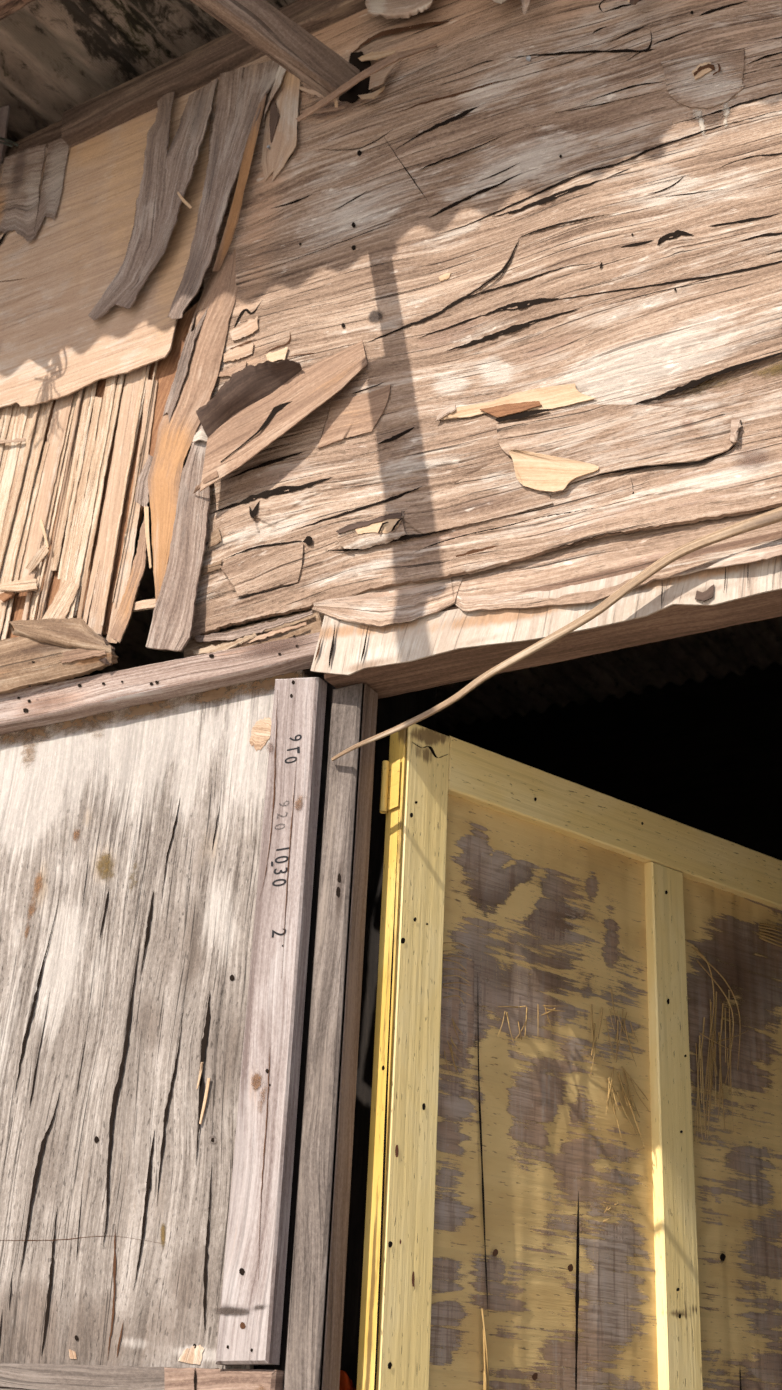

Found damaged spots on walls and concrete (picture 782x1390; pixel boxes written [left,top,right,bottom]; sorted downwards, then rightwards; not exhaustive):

peeling [365,0,433,19]
peeling [168,60,286,319]
crack [231,0,782,357]
spalling [0,361,158,644]
crack [212,427,737,559]
crack [634,352,782,405]
peeling [695,544,782,602]
crack [0,800,212,1356]
crack [477,991,488,1307]
peeling [430,823,655,1390]
crack [573,1191,581,1390]
peeling [686,898,782,1390]